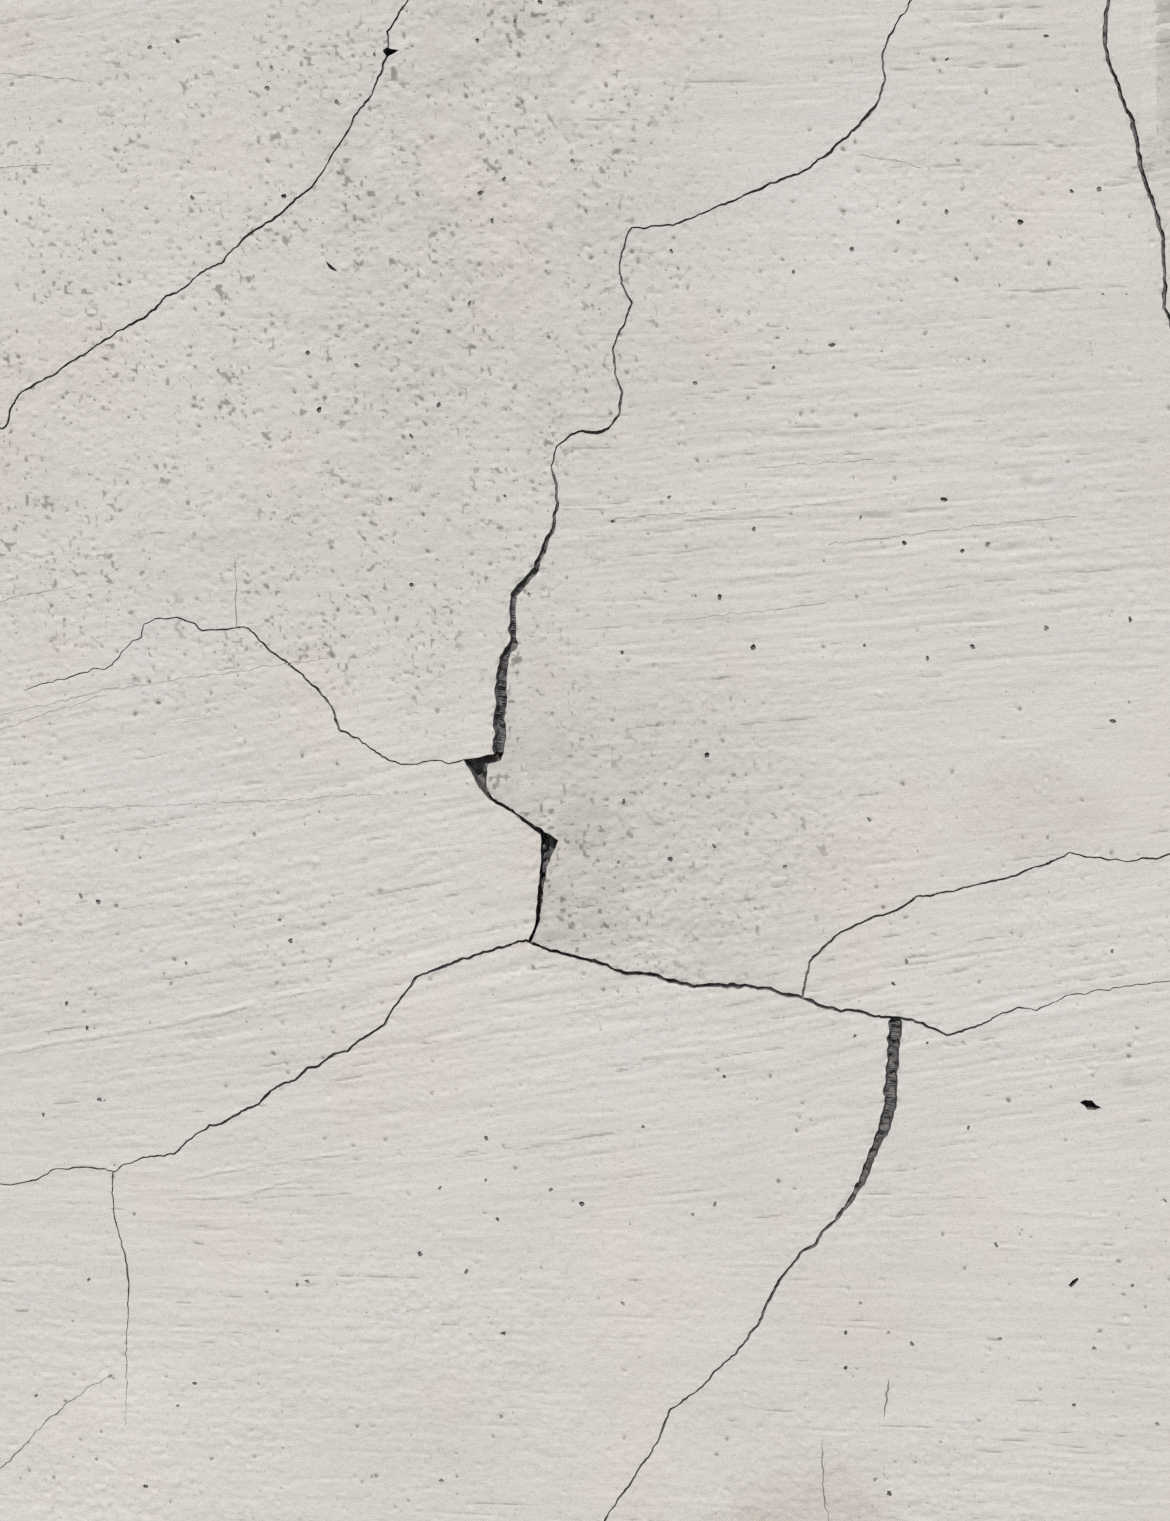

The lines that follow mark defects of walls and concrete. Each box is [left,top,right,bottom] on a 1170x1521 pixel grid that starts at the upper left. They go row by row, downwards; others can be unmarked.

crack [1102,0,1170,328]
crack [0,0,912,1372]
crack [0,1378,106,1468]
crack [529,852,1170,1521]